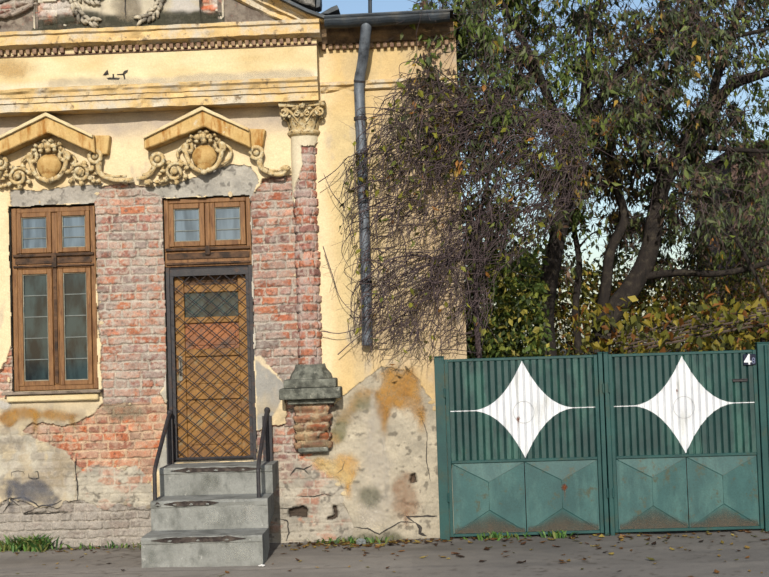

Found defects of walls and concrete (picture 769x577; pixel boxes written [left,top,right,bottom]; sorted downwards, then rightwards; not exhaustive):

spalling [0,0,74,26]
spalling [0,141,323,549]
peeling [269,366,466,543]
damp [8,479,57,505]
crack [3,461,78,515]
crack [356,515,435,536]